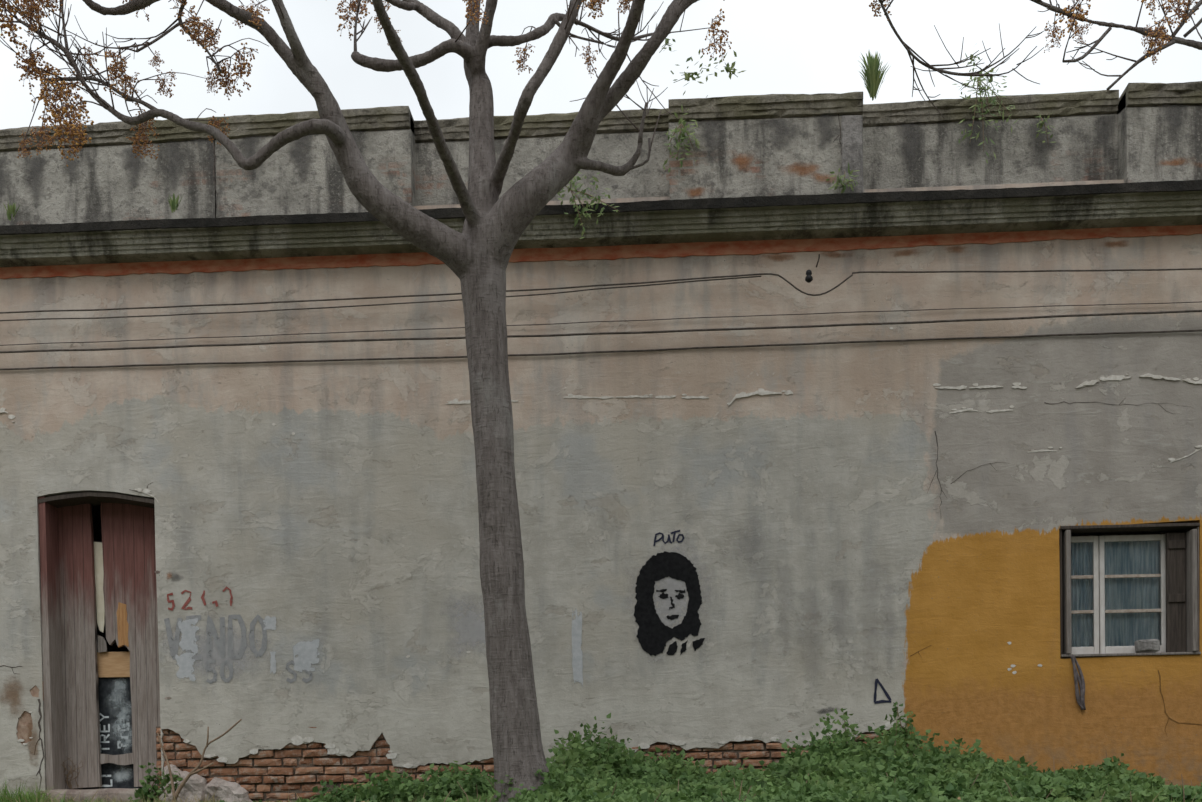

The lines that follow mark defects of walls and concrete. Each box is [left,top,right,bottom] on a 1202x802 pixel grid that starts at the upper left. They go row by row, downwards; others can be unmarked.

flaking render [17,682,44,745]
flaking render [156,727,494,802]
flaking render [623,722,895,775]